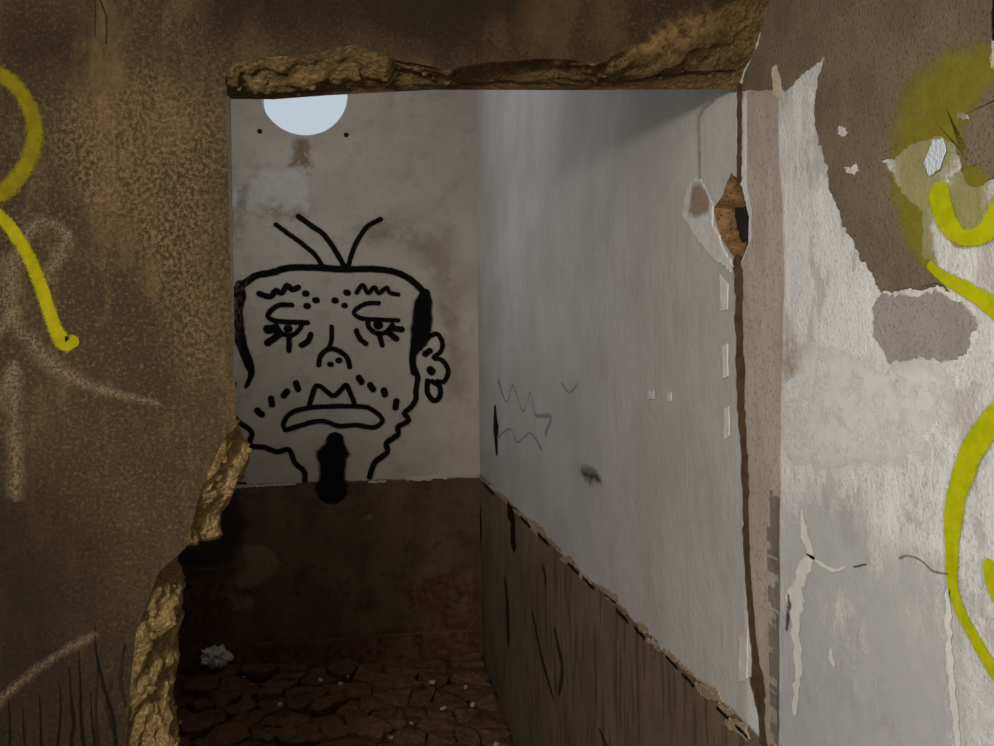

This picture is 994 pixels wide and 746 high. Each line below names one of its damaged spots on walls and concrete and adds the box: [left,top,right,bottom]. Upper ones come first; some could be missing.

crack [94,0,107,44]
crack [986,0,994,41]
peeling [225,0,994,364]
peeling [406,472,448,481]
flaking render [126,416,296,746]